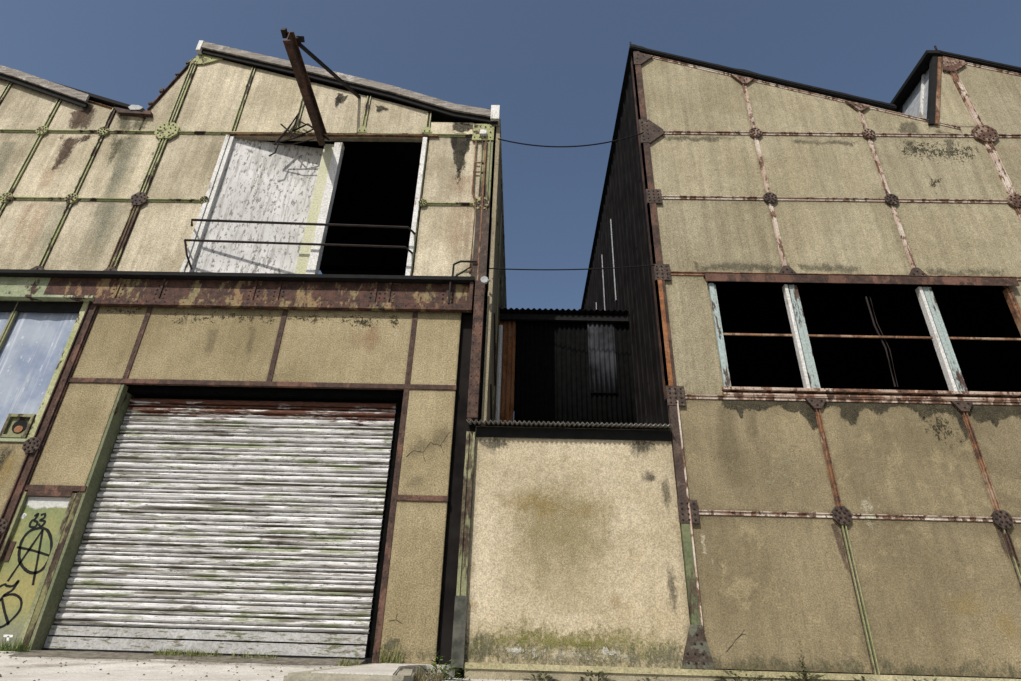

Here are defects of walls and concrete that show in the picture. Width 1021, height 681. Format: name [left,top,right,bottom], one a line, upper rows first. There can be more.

damp [51,105,94,170]
damp [450,123,473,183]
damp [898,122,979,164]
rust [658,280,673,386]
damp [500,644,628,662]